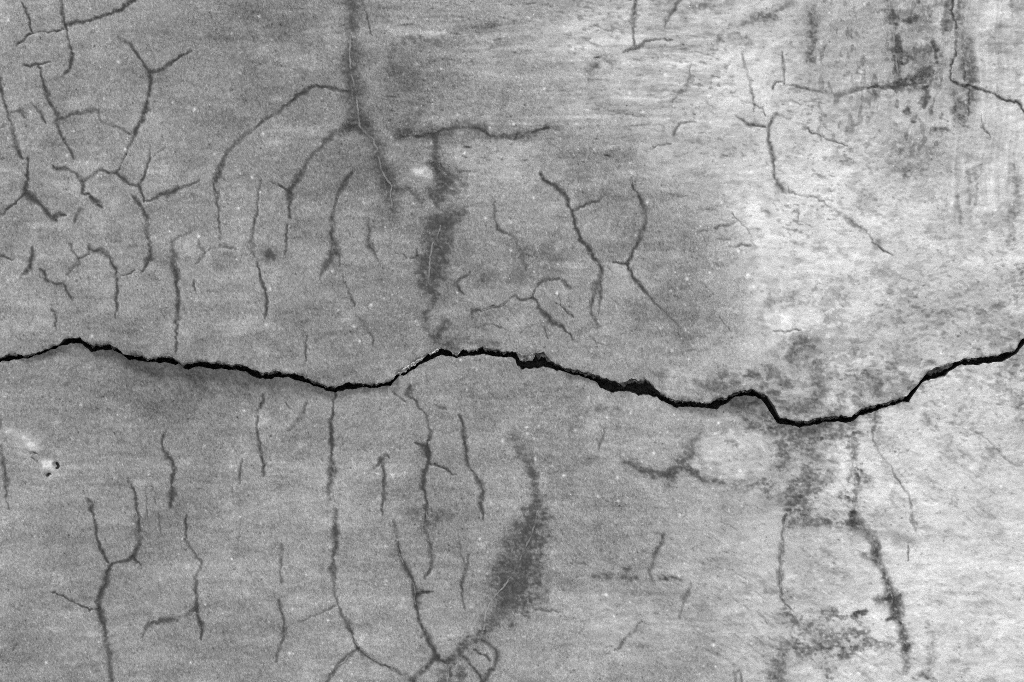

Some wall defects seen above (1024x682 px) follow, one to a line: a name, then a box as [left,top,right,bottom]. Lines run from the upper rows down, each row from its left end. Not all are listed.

damp [417,131,465,318]
crack [0,0,1024,534]
crack [53,487,141,682]
crack [147,559,203,639]
crack [330,510,339,576]
crack [327,624,390,682]
crack [397,543,499,682]
damp [447,466,546,661]
crack [863,549,911,651]